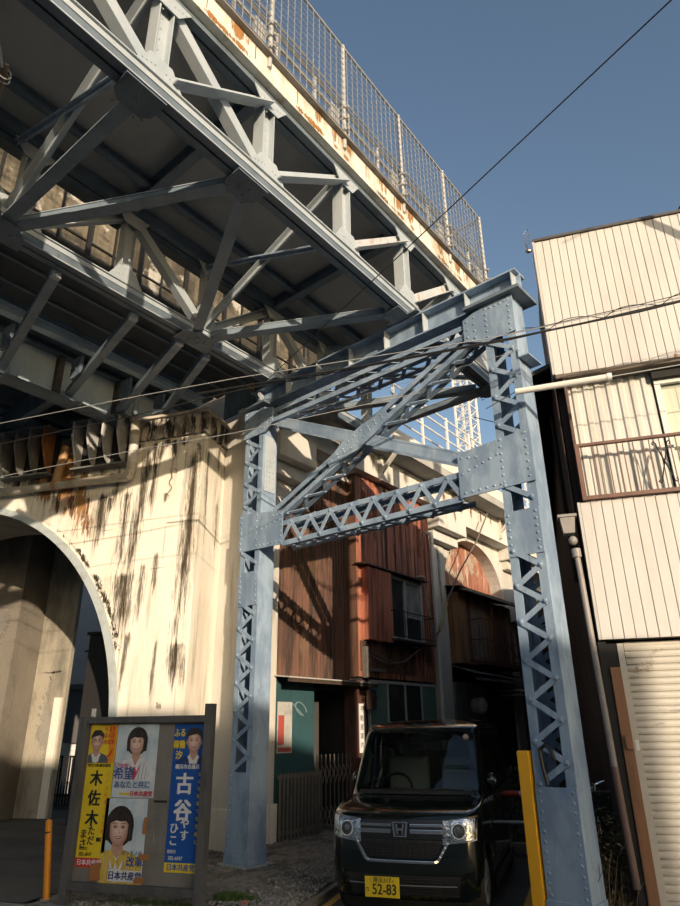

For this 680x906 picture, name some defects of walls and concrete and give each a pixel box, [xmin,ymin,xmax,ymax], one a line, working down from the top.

rust [231,19,249,51]
rust [315,110,352,161]
rust [379,180,414,230]
rust [34,453,93,542]
damp [92,437,226,688]